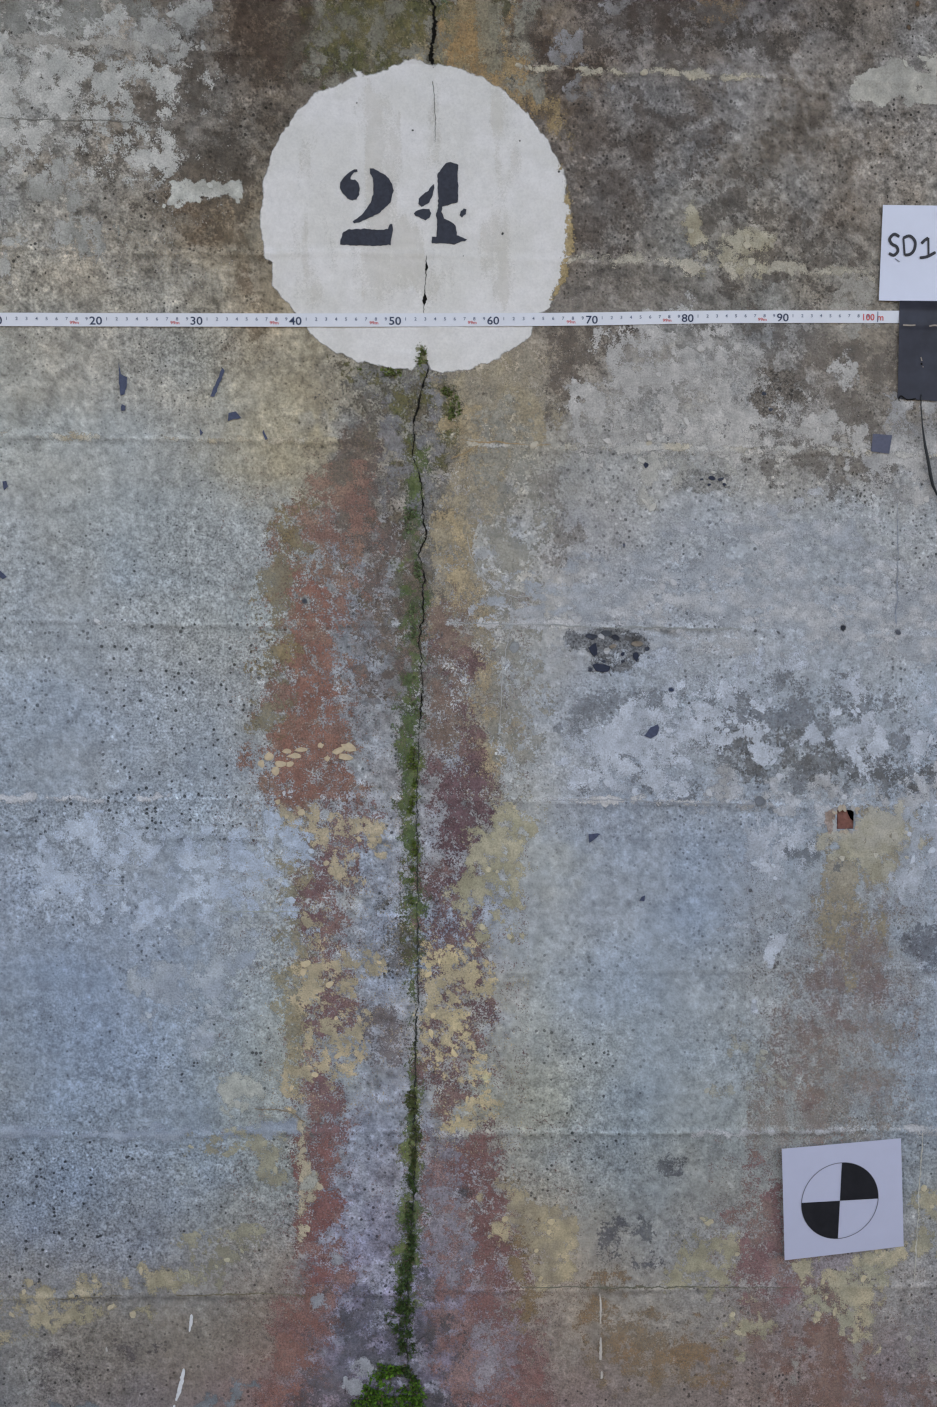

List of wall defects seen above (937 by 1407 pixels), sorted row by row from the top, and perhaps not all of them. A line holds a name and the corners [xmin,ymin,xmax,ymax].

crack [426,0,439,129]
crack [421,255,429,312]
crack [405,364,743,1367]